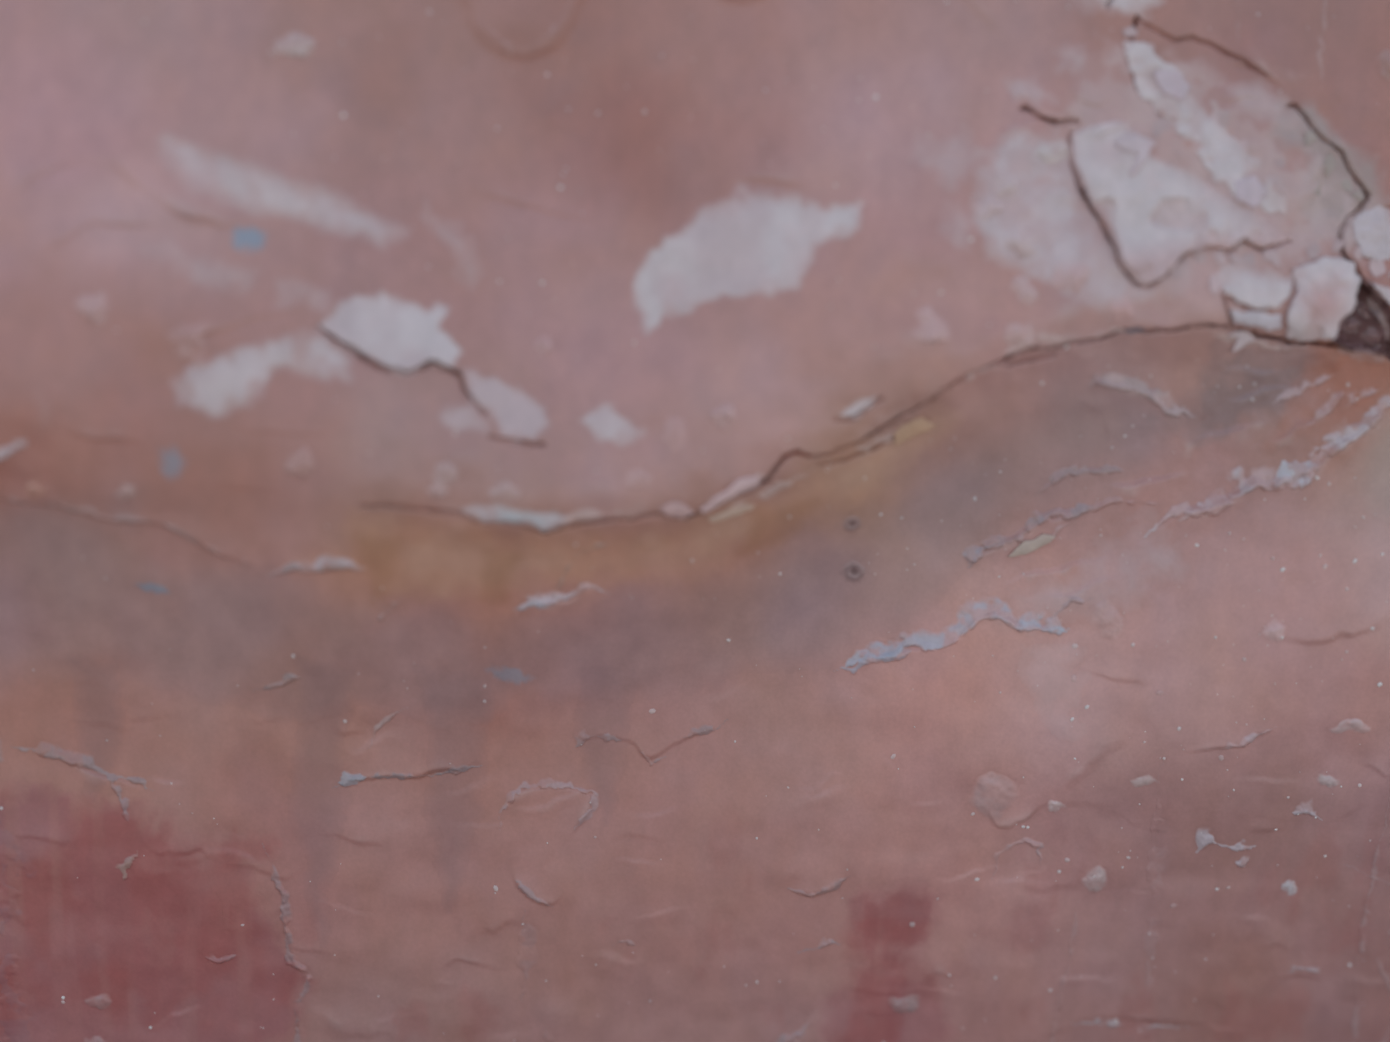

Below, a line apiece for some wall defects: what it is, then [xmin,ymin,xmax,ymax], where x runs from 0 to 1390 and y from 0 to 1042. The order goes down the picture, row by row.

peeling [154,131,486,294]
peeling [630,179,869,338]
peeling [911,0,1390,365]
crack [1019,106,1291,287]
peeling [137,236,554,447]
crack [316,325,546,446]
peeling [578,402,649,449]
crack [361,295,1390,535]
peeling [1083,369,1199,421]
peeling [1143,373,1390,538]
peeling [265,553,367,577]
peeling [832,594,1092,675]